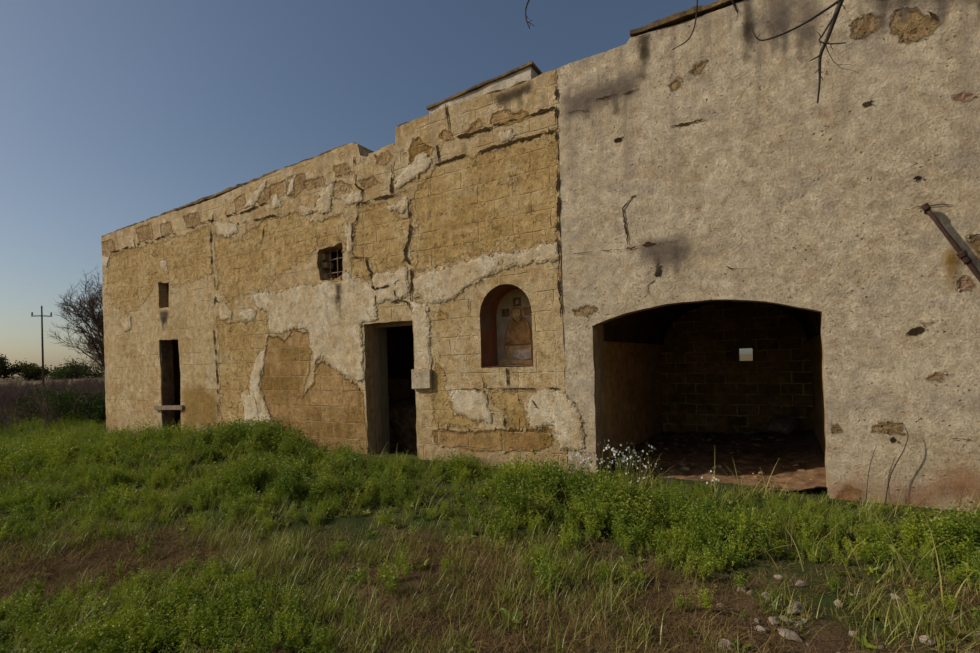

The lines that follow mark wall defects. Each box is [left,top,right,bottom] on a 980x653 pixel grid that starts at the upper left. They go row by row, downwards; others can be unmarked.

flaking render [848,6,941,44]
peeling [101,108,585,454]
crack [336,153,419,312]
crack [435,72,681,316]
flaking render [871,420,903,435]